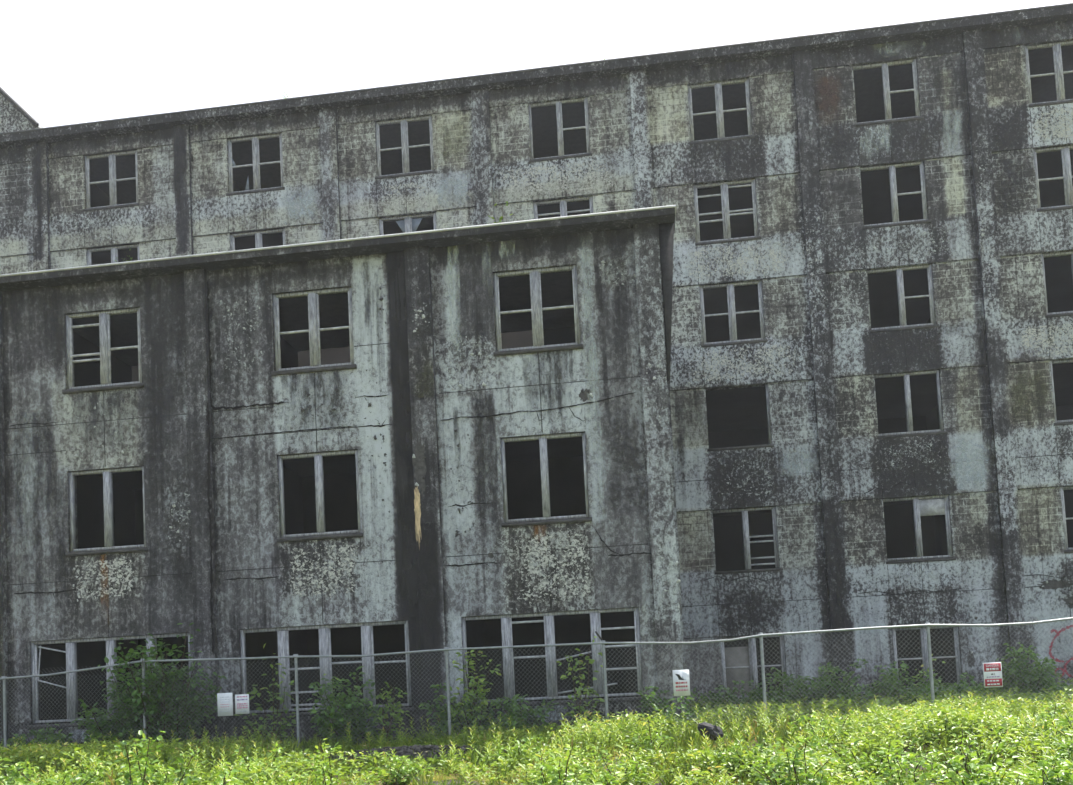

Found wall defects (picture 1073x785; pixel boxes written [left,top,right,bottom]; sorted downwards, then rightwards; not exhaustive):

damp [377,251,413,473]
spalling [412,432,427,551]
damp [400,487,439,666]